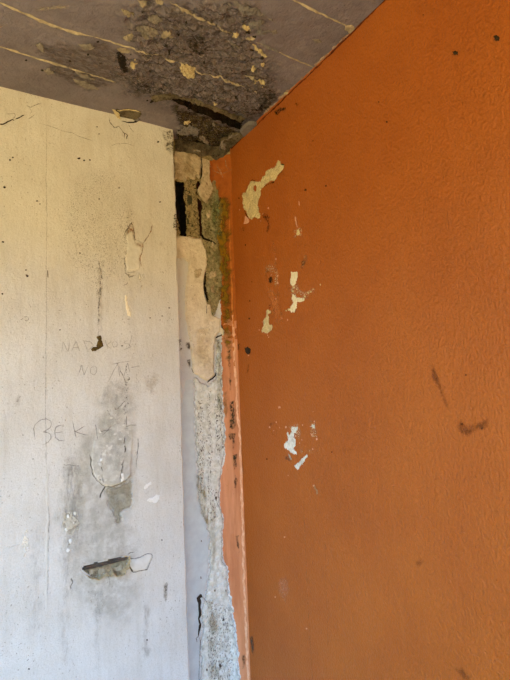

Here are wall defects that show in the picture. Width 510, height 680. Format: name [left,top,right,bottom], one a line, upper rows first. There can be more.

spalling [36,0,349,150]
peeling [239,160,285,228]
flaking render [173,151,224,383]
peeling [286,272,314,313]
peeling [259,309,273,338]
peeling [269,421,317,470]
spalling [81,555,131,582]